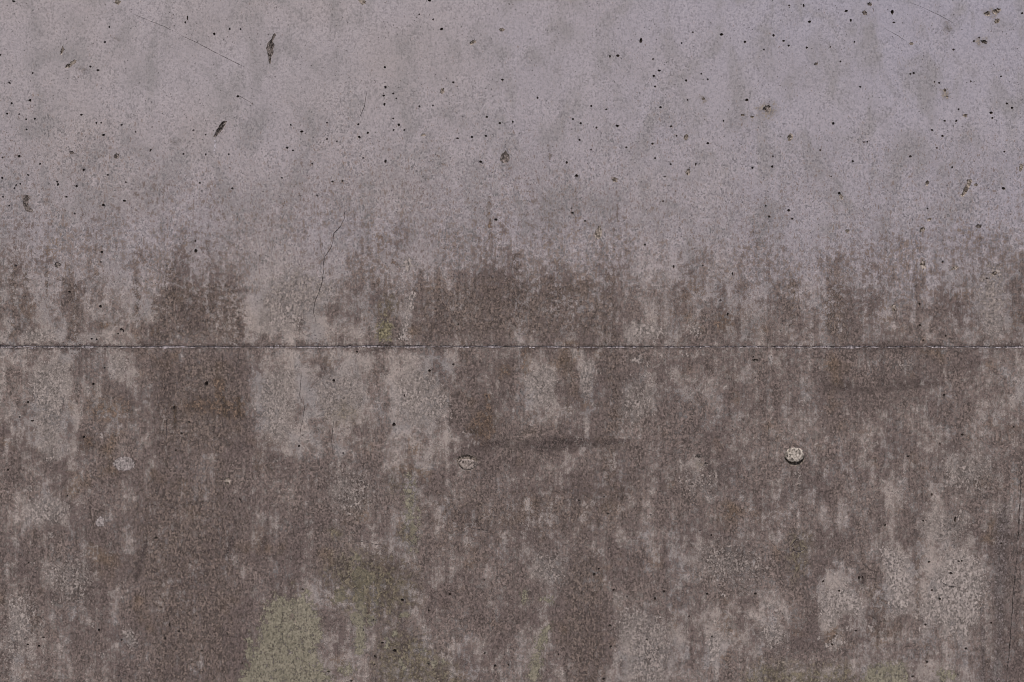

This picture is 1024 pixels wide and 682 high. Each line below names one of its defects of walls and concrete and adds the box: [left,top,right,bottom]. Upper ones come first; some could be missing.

water stain [118,259,267,682]
crack [302,212,345,336]
water stain [412,253,647,682]
water stain [859,572,904,646]